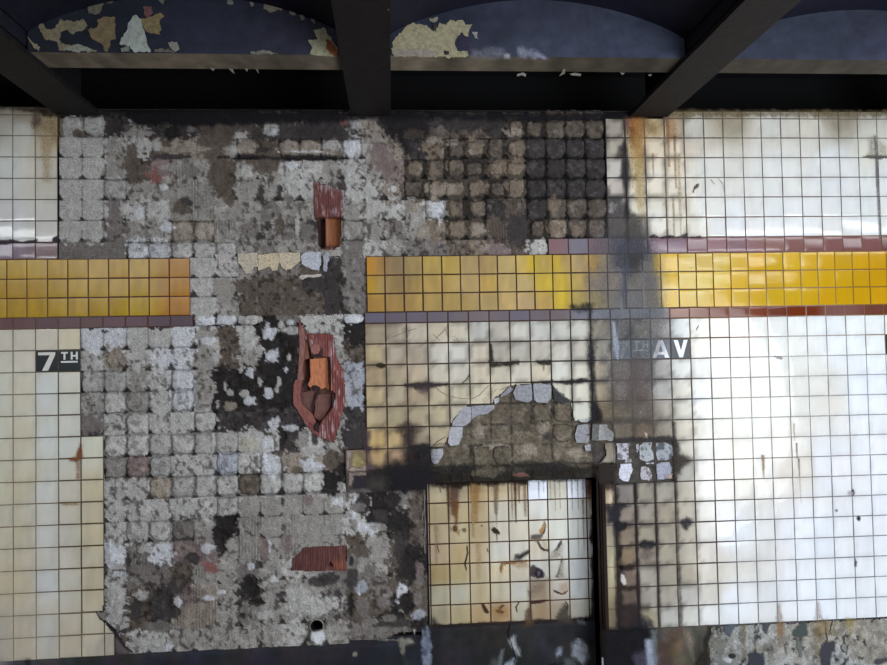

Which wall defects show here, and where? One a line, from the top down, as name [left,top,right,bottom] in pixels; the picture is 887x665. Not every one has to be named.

peeling [27,0,179,53]
peeling [250,2,339,57]
peeling [391,17,478,59]
rust [626,120,681,219]
spalling [59,109,608,665]
spalling [430,383,674,484]
rust [447,485,459,525]
rust [511,483,526,521]
water stain [640,540,656,557]
peeling [708,618,887,665]